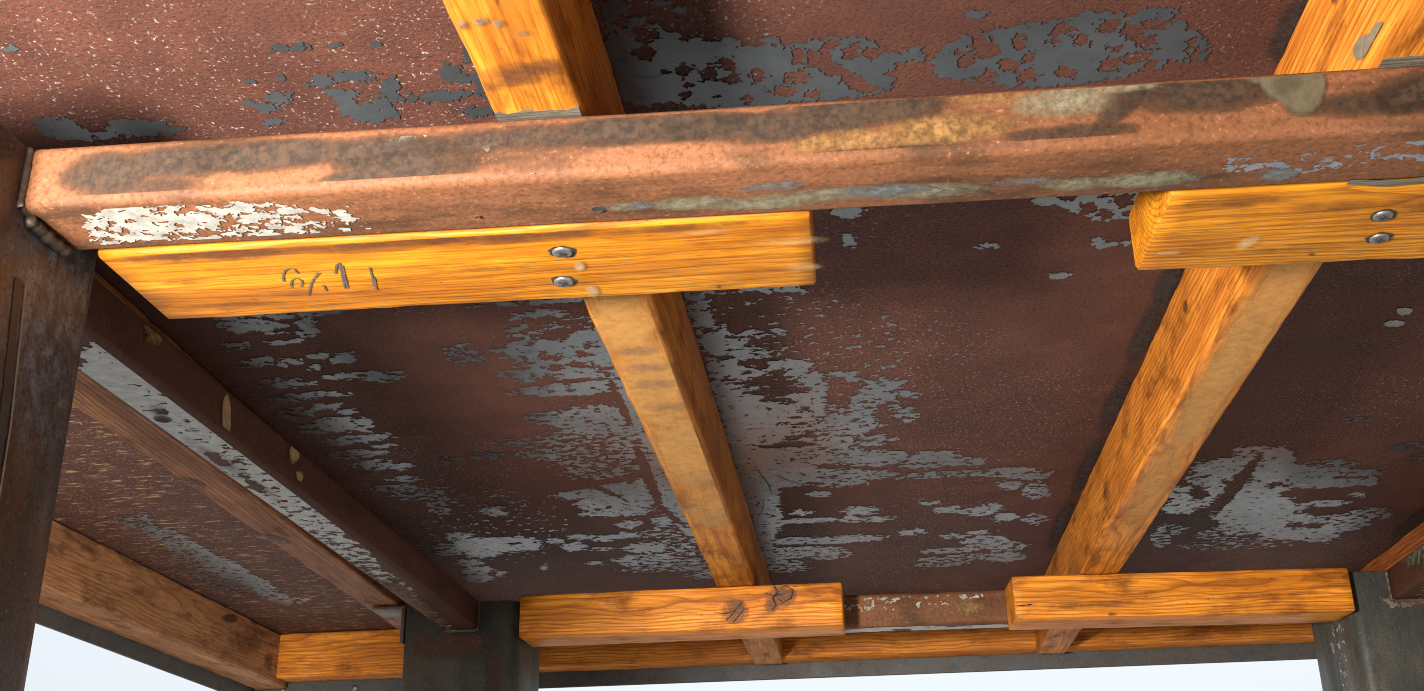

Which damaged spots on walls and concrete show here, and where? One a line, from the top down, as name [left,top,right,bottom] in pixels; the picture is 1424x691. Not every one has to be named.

peeling [242,42,494,137]
corrosion [60,79,1274,195]
peeling [599,0,1212,109]
peeling [1222,140,1424,174]
corrosion [1310,73,1424,116]
peeling [81,201,371,245]
peeling [78,342,419,604]
peeling [213,297,713,583]
peeling [680,286,1054,573]
peeling [1150,445,1393,550]
peeling [1382,587,1424,608]